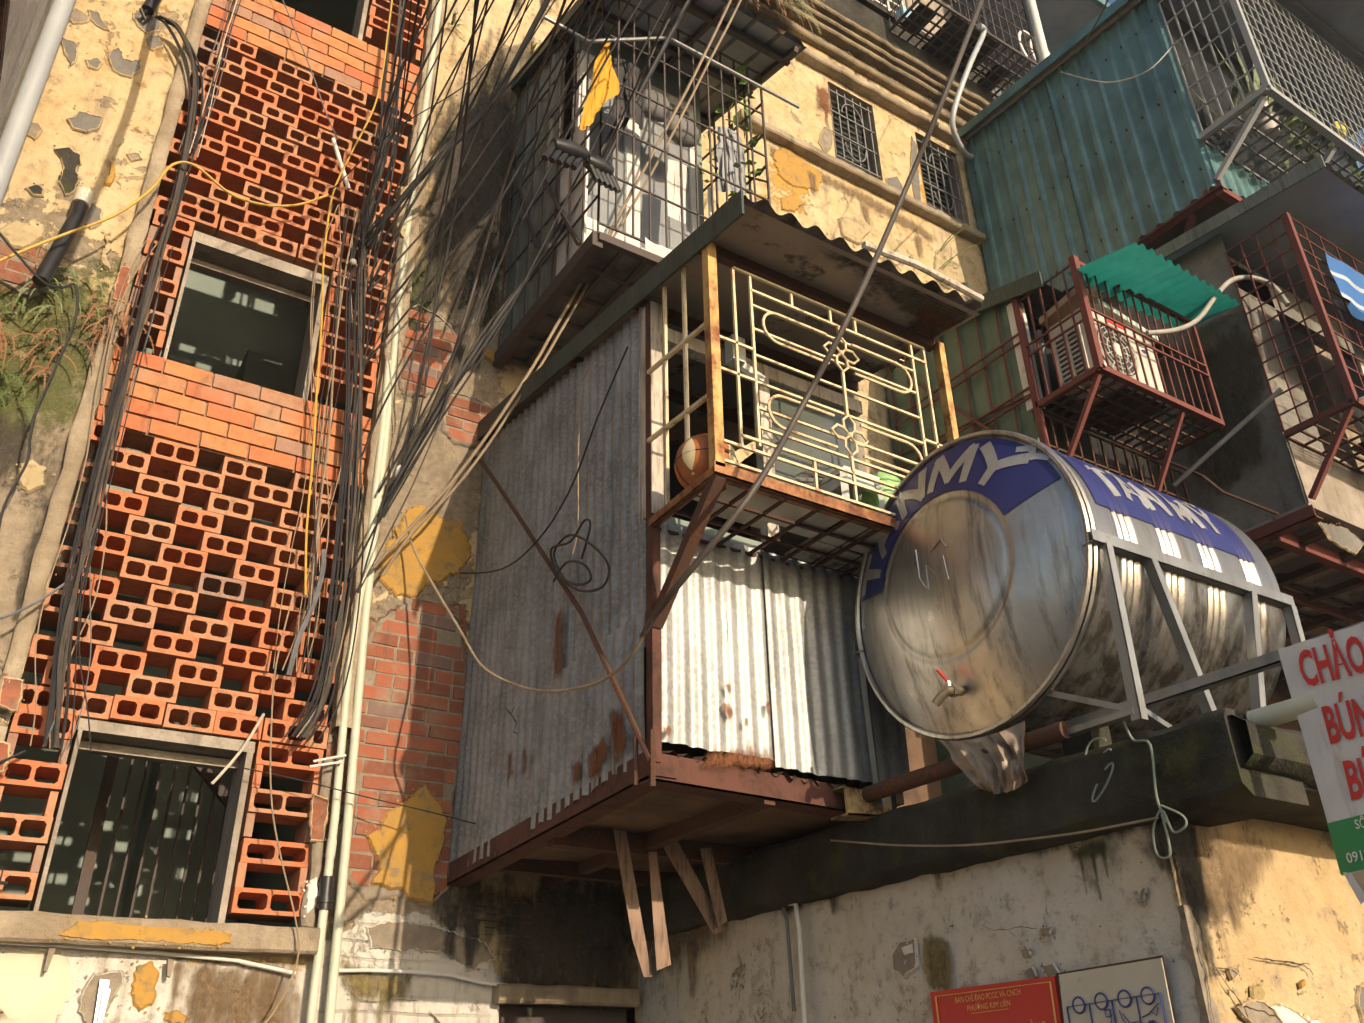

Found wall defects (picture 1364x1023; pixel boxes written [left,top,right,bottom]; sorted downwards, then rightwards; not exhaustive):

flaking render [24,122,83,198]
flaking render [398,304,496,451]
corrosion [553,611,563,674]
flaking render [308,505,496,971]
corrosion [571,710,626,798]
corrosion [722,684,748,726]
corrosion [706,746,772,769]
damp [1078,846,1108,900]
flaking render [46,914,242,1023]
damp [343,962,411,1023]
damp [445,914,478,966]
flaking render [1177,905,1310,1023]